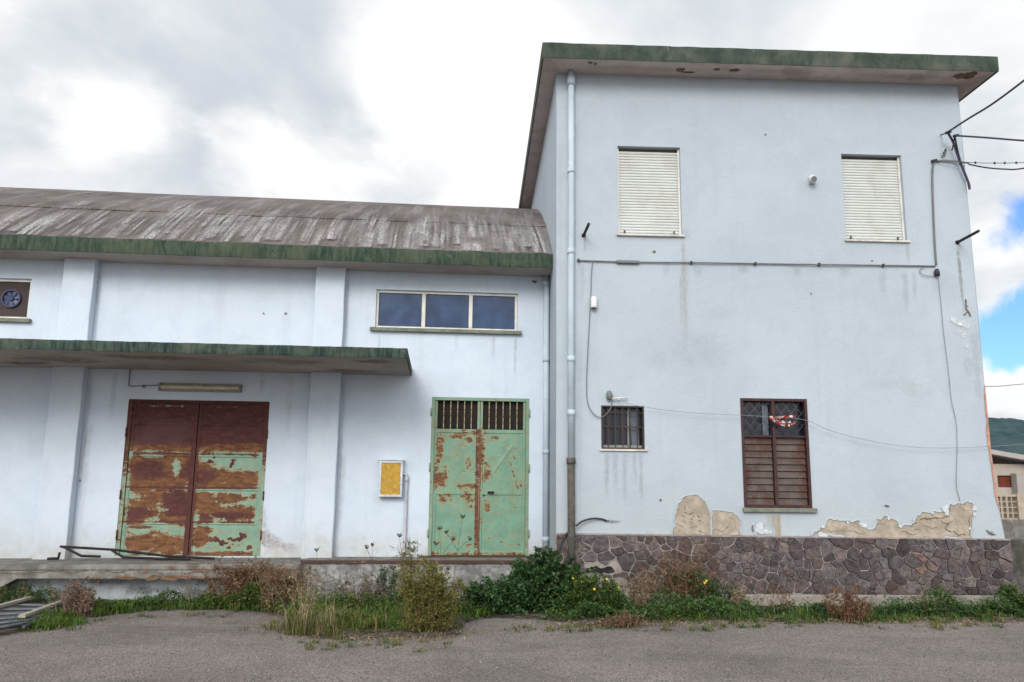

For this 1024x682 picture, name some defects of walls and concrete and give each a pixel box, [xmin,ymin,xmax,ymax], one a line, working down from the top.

flaking render [672,493,773,535]
flaking render [811,500,978,538]